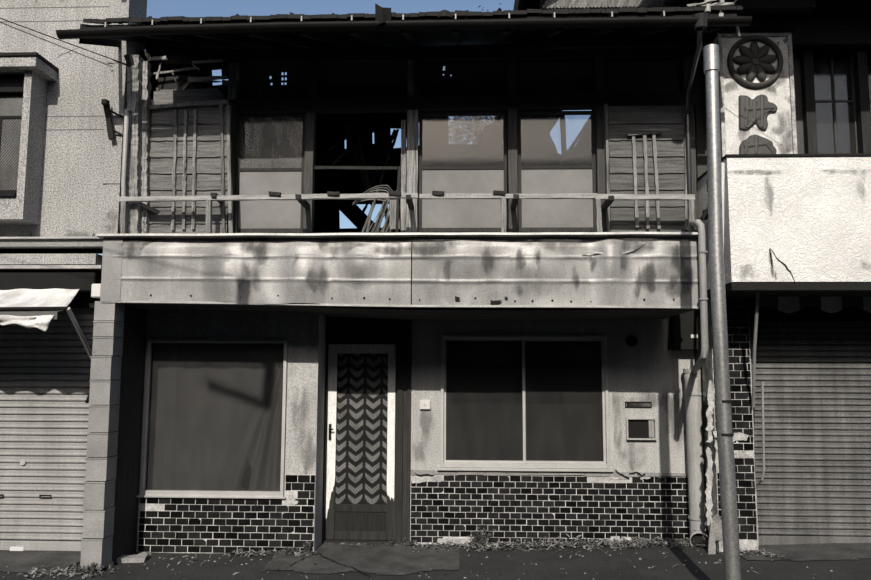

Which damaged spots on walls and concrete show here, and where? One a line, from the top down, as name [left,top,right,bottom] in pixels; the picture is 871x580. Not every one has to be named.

crack [769,248,796,283]
flaking render [733,432,748,442]
flaking render [705,380,723,541]